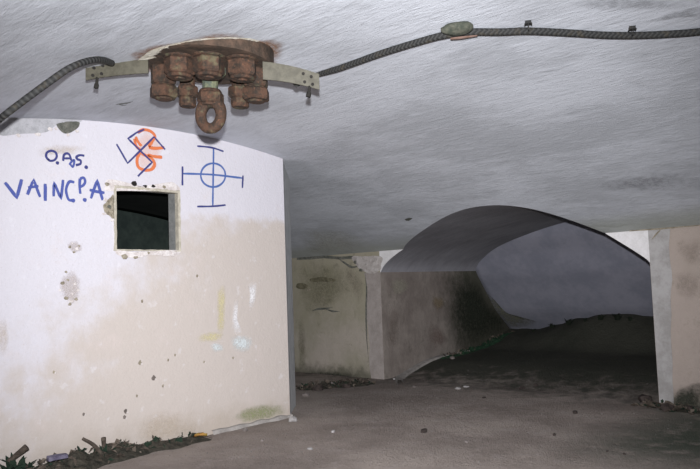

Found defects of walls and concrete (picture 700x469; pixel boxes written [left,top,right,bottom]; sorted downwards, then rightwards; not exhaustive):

spalling [0,118,82,137]
spalling [102,179,180,221]
spalling [115,250,180,259]
peeling [59,271,80,306]